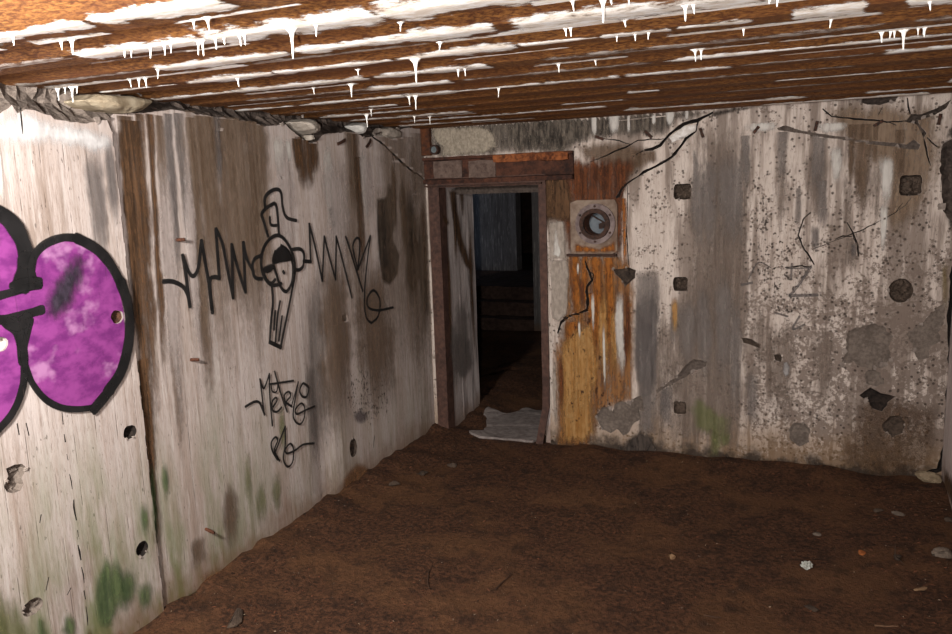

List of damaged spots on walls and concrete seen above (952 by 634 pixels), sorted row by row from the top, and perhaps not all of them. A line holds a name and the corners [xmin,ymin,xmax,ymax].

leakage [0,0,952,245]
crack [590,111,713,265]
crack [822,98,911,125]
leakage [0,113,428,530]
leakage [443,190,475,376]
rust [493,151,633,445]
crack [557,260,594,333]
leakage [603,301,624,377]
peeling [595,395,644,435]
spalling [656,359,707,393]
leakage [620,123,792,451]
crack [944,267,952,363]